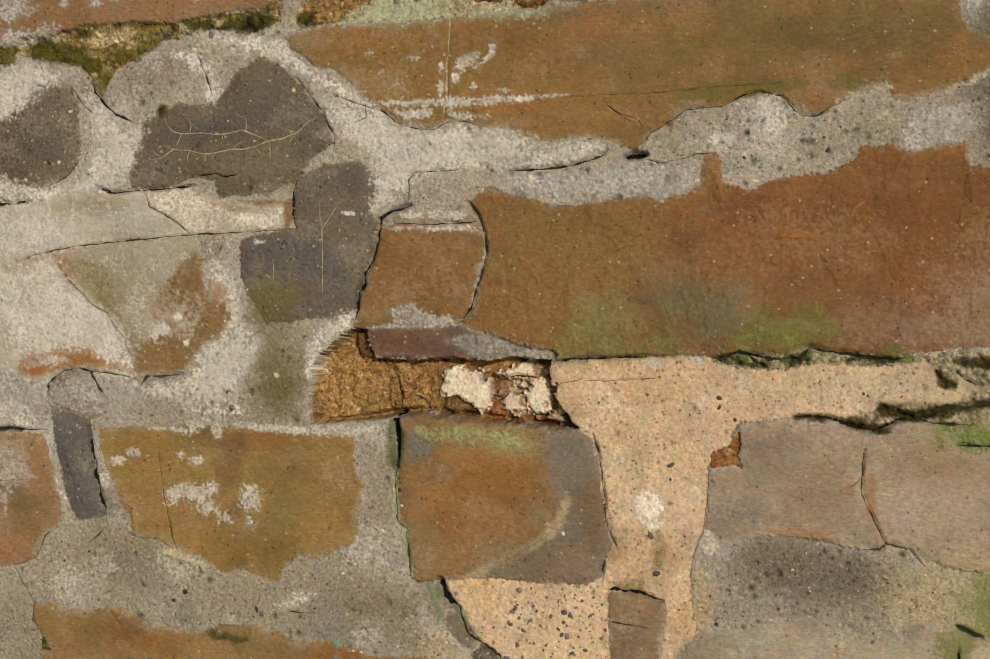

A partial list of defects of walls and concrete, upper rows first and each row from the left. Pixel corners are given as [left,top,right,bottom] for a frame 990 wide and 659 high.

damp [171,48,223,103]
crack [20,17,474,261]
crack [319,202,340,295]
damp [163,481,233,523]
damp [238,485,259,525]
crack [794,369,990,566]